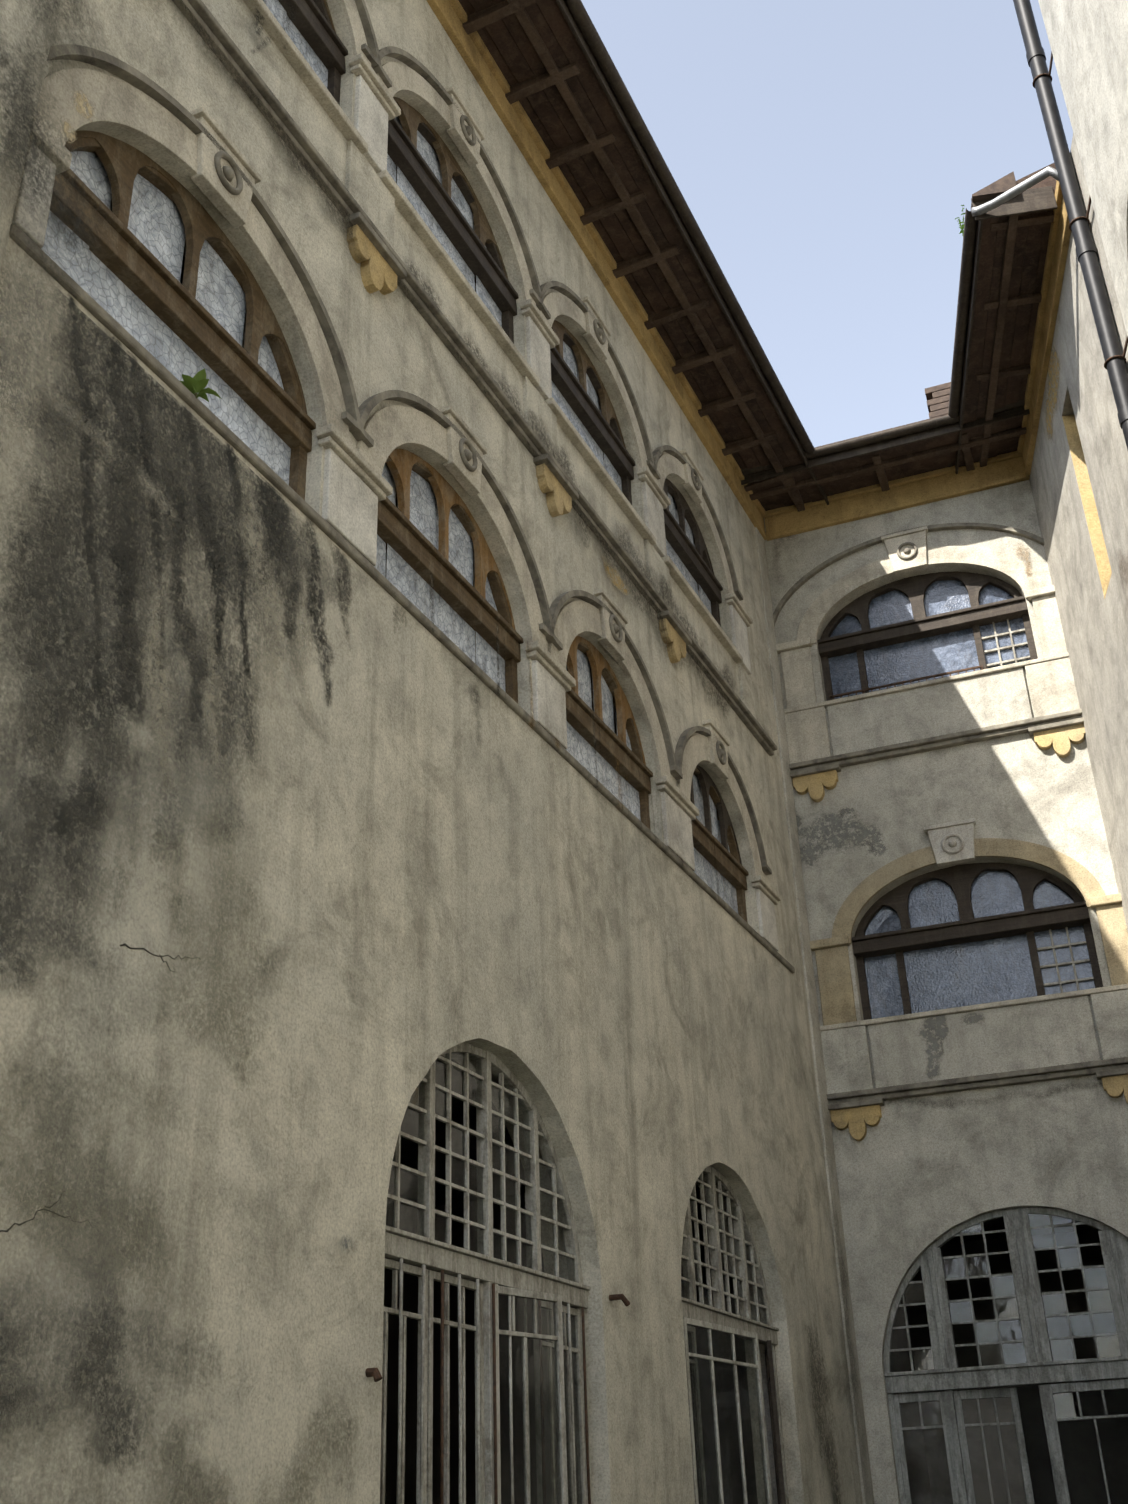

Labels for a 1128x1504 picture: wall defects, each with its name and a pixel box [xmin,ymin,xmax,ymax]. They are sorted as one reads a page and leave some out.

leakage [0,0,772,875]
leakage [0,266,351,987]
flaking render [796,808,885,866]
crack [120,943,200,972]
crack [0,1190,98,1232]
leakage [0,1288,149,1459]